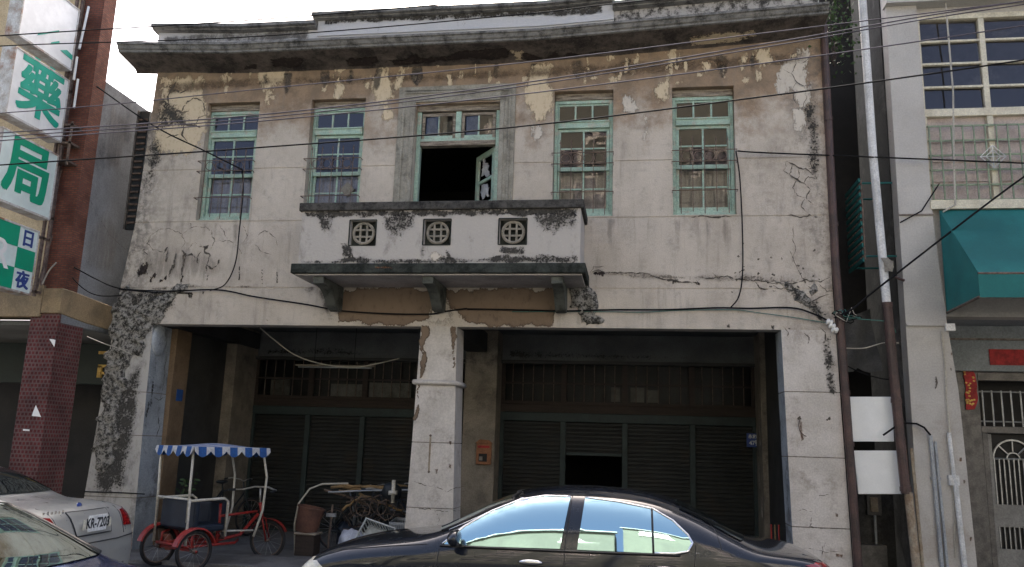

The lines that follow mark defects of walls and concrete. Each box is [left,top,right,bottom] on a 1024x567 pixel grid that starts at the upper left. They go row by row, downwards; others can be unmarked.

peeling [153,75,209,157]
peeling [322,48,640,144]
peeling [652,49,726,102]
peeling [690,30,813,141]
damp [804,102,821,185]
crack [86,192,278,275]
damp [305,208,577,238]
damp [312,243,578,263]
crack [591,155,830,302]
flaking render [338,287,555,421]
damp [823,336,837,394]
damp [94,365,156,492]